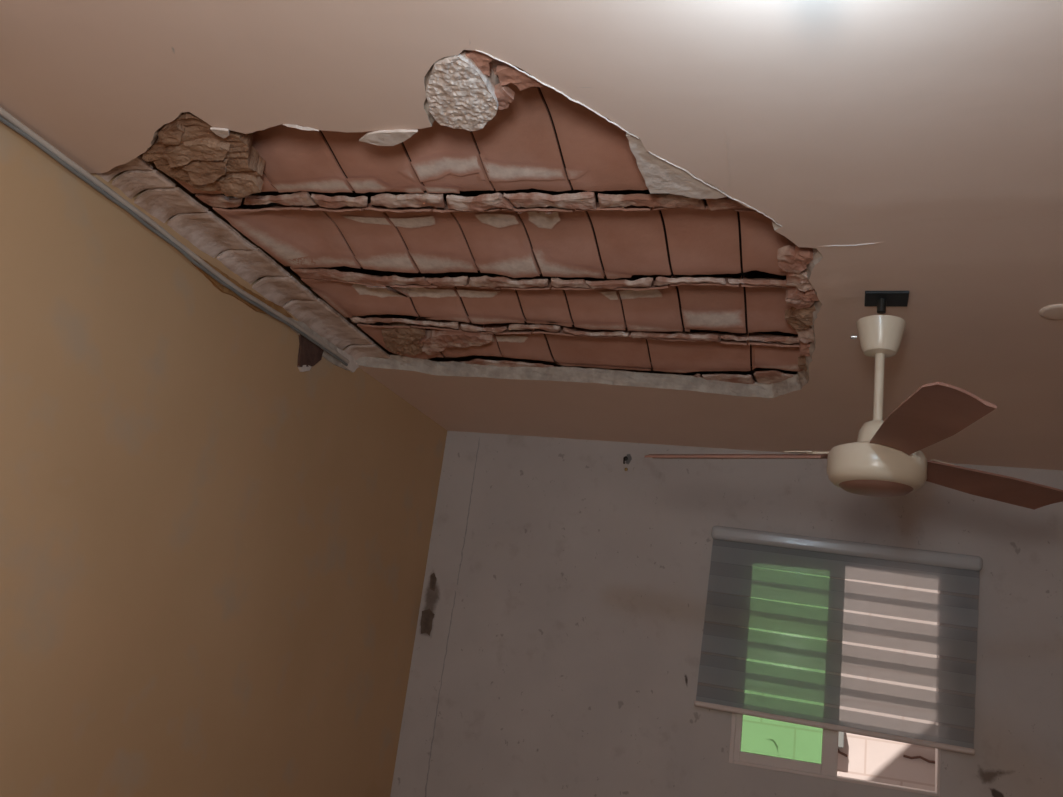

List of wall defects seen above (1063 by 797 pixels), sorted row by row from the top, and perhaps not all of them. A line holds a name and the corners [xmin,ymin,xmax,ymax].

spalling [96,50,823,398]
peeling [417,566,442,641]